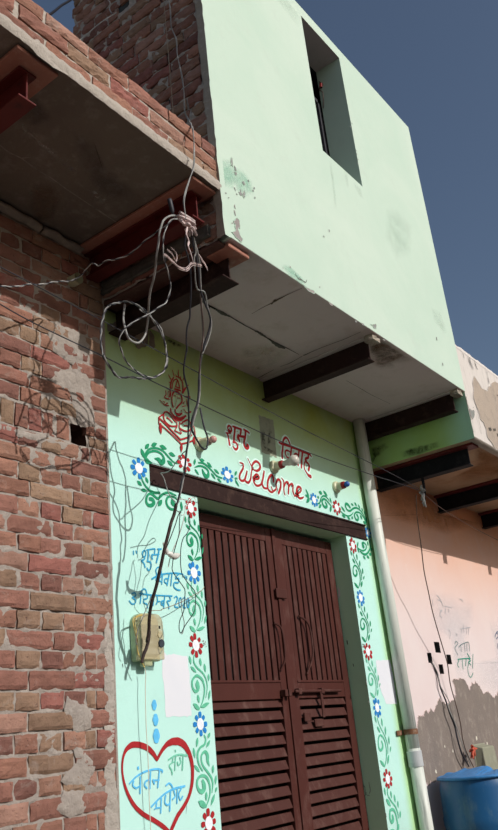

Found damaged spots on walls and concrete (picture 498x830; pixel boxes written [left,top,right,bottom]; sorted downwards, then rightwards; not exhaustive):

peeling [225,157,255,242]
crack [203,273,360,379]
peeling [469,376,498,450]
peeling [417,678,498,785]